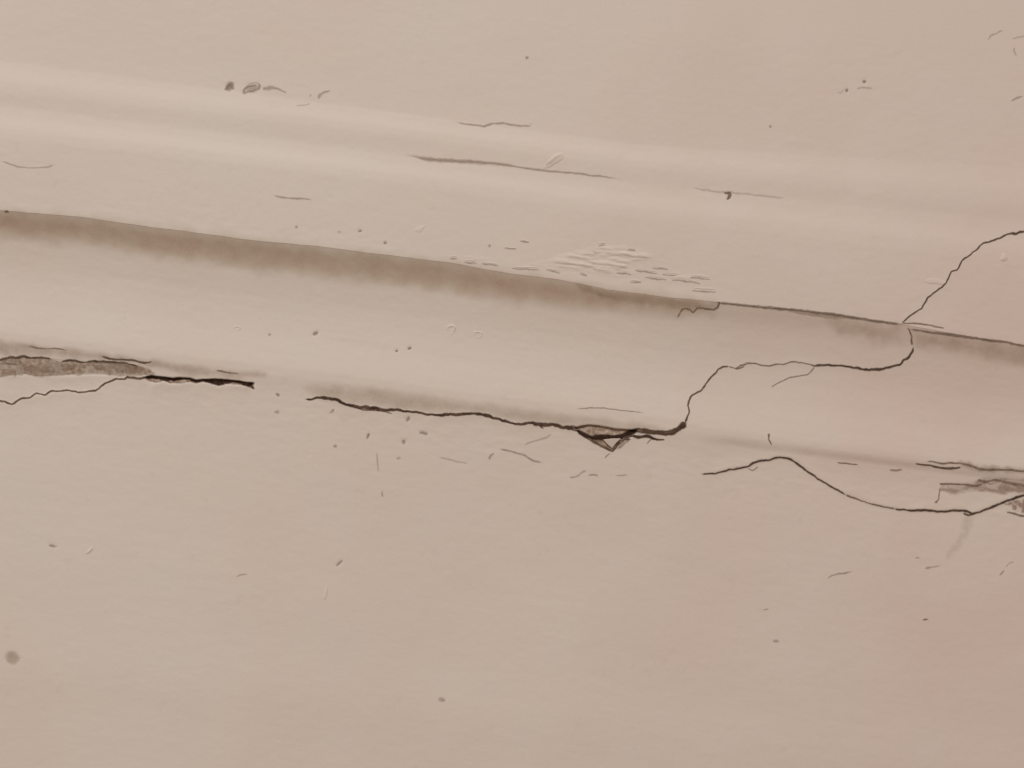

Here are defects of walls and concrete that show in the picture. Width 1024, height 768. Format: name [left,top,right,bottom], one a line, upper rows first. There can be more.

crack [621,231,1024,442]
peeling [0,355,154,376]
crack [0,370,254,405]
crack [306,396,583,432]
spalling [574,425,636,452]
crack [703,434,1024,517]
peeling [935,479,1024,503]